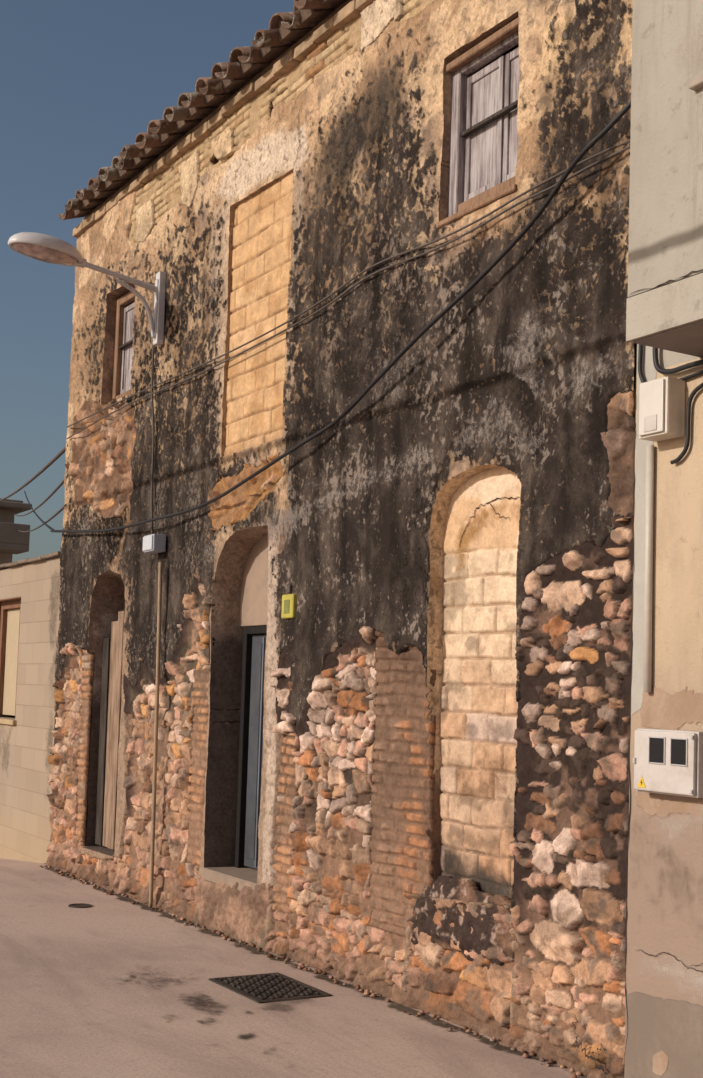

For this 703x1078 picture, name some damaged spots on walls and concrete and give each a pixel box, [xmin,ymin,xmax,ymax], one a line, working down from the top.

peeling [129,0,433,245]
leakage [50,0,636,725]
crack [457,496,520,552]
crack [629,381,637,687]
leakage [496,746,519,838]
crack [571,734,703,1075]